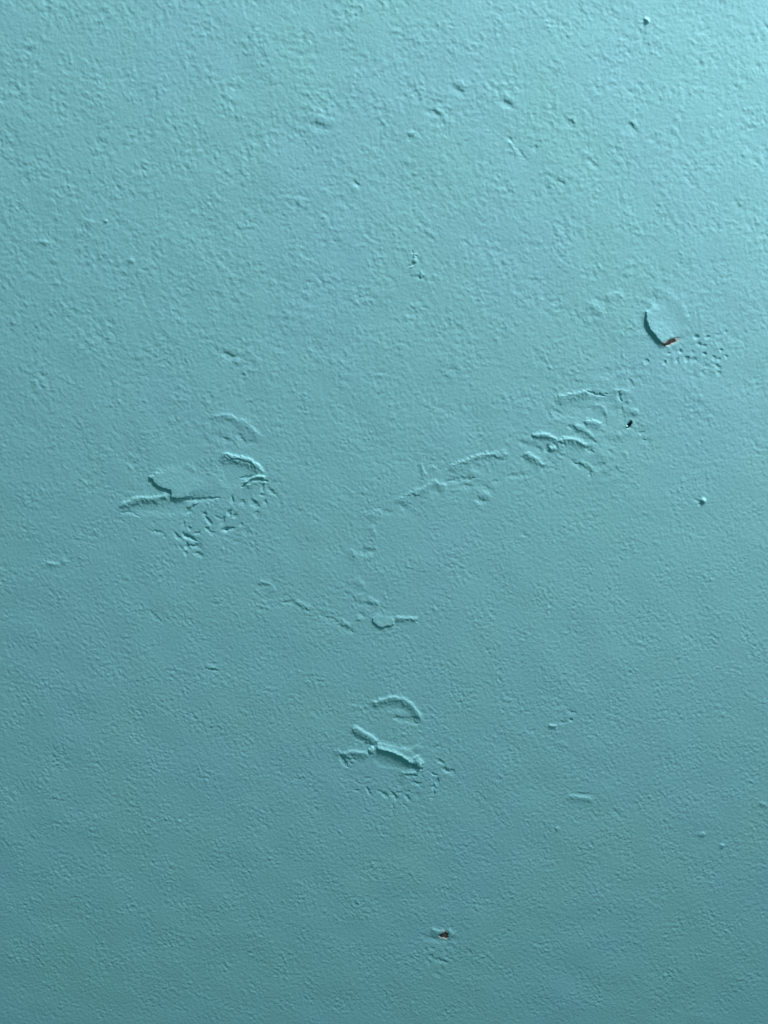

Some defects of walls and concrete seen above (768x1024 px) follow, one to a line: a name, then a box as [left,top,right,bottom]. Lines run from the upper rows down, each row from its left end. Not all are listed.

peeling [642,284,728,370]